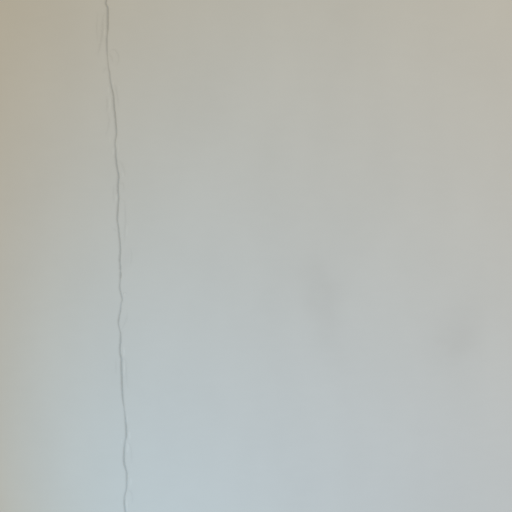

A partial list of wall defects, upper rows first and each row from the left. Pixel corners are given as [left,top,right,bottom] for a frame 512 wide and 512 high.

crack [95,0,134,512]